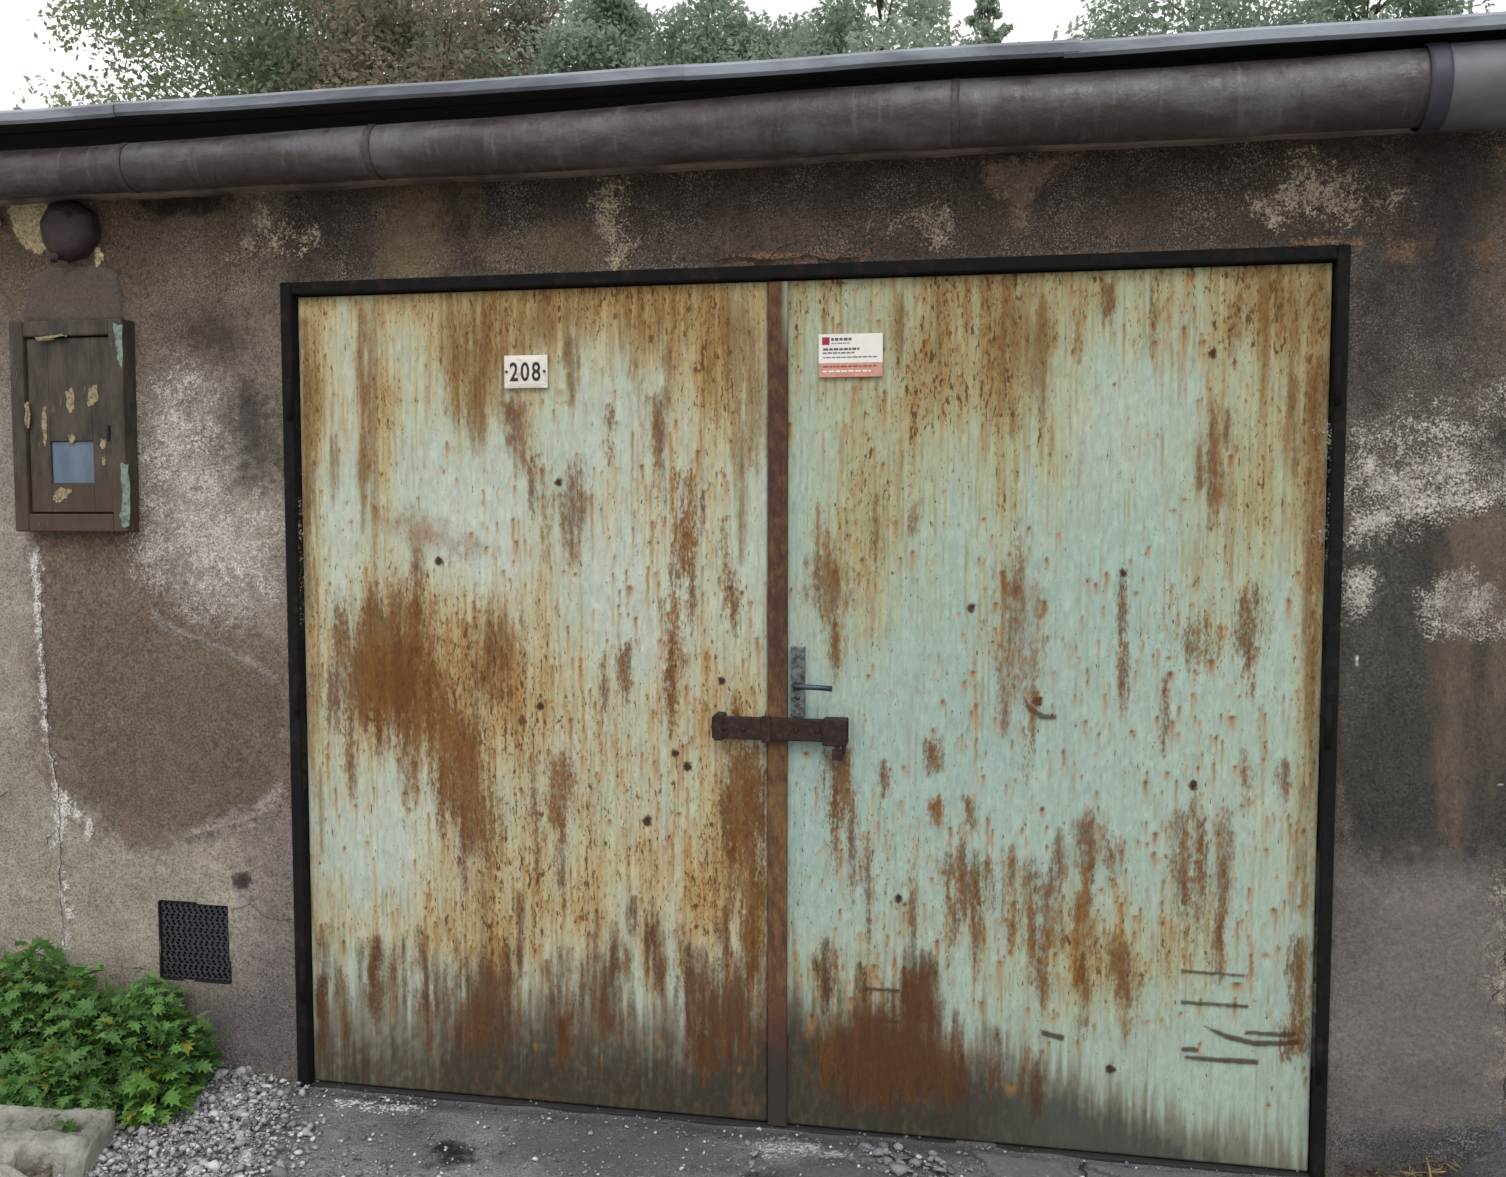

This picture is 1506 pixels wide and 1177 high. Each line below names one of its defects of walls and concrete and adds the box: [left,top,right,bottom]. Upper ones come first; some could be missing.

water stain [1242,133,1480,334]
crack [40,558,66,947]
water stain [33,350,310,850]
corrosion [316,539,524,1060]
corrosion [448,295,587,564]
corrosion [546,739,768,1086]
corrosion [641,387,741,771]
corrosion [822,750,872,943]
corrosion [807,796,1144,1116]
corrosion [1115,569,1130,710]
corrosion [1172,753,1252,983]
water stain [1311,378,1506,878]